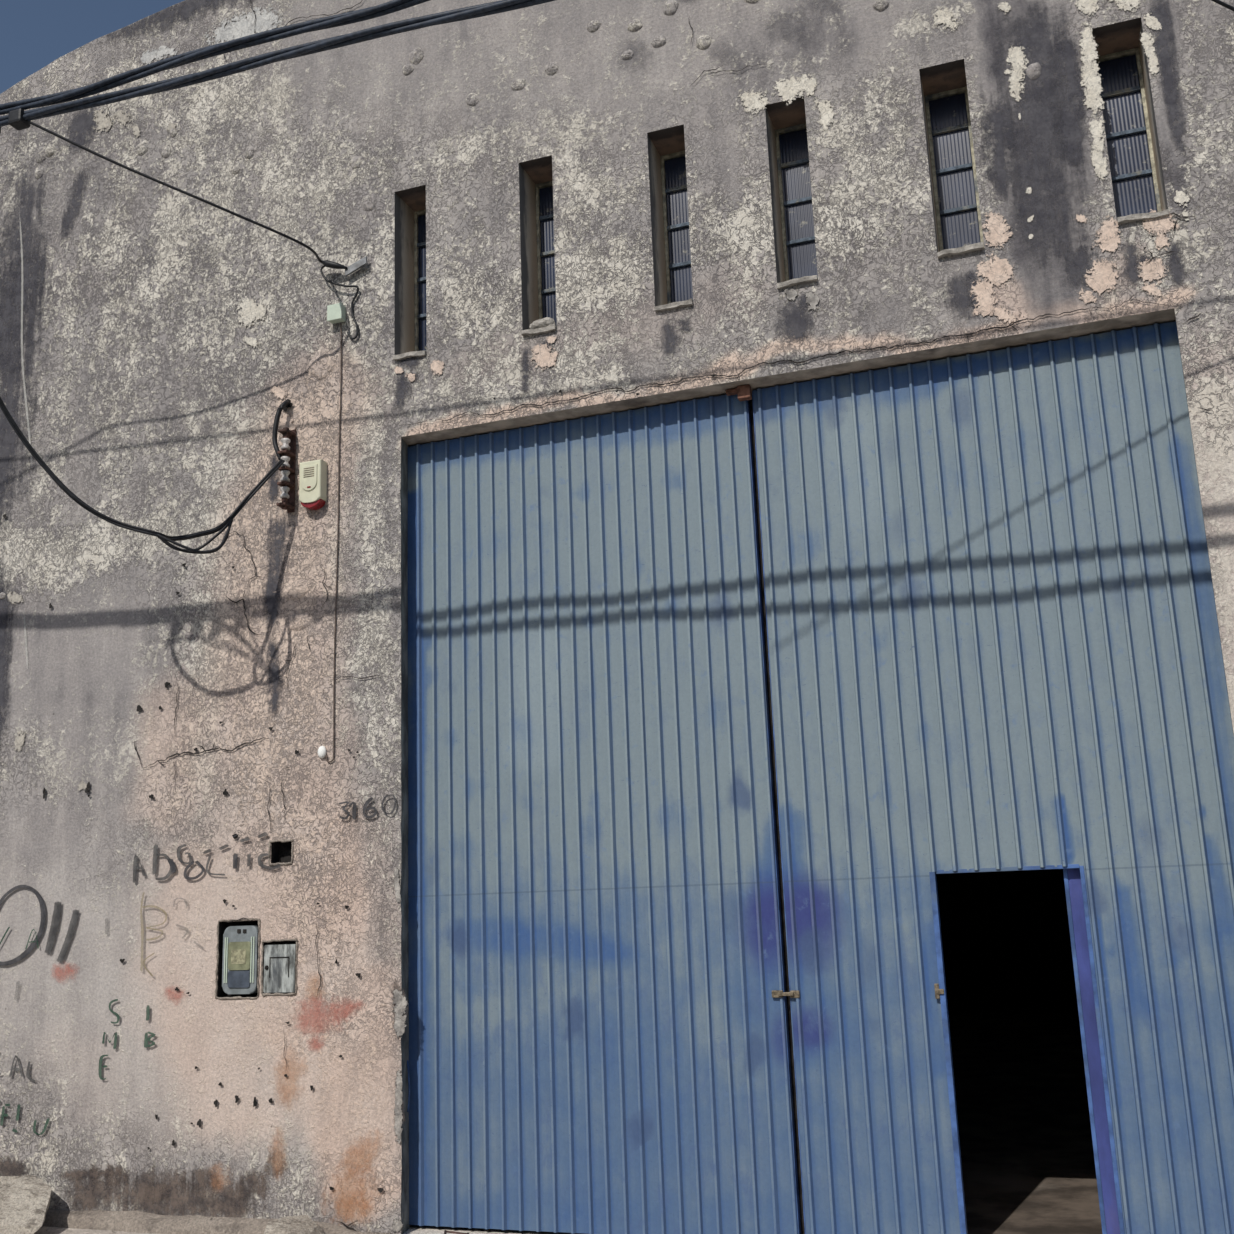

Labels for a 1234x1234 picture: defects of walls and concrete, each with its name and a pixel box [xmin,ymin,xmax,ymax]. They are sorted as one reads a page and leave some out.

crack [285,1,362,26]
crack [690,64,770,86]
peeling [1004,44,1029,120]
damp [983,5,1091,287]
peeling [1075,0,1162,181]
damp [0,175,46,525]
crack [400,295,1201,428]
damp [943,272,979,317]
peeling [970,209,1020,326]
peeling [1076,214,1121,305]
crack [1146,212,1193,264]
damp [264,519,289,713]